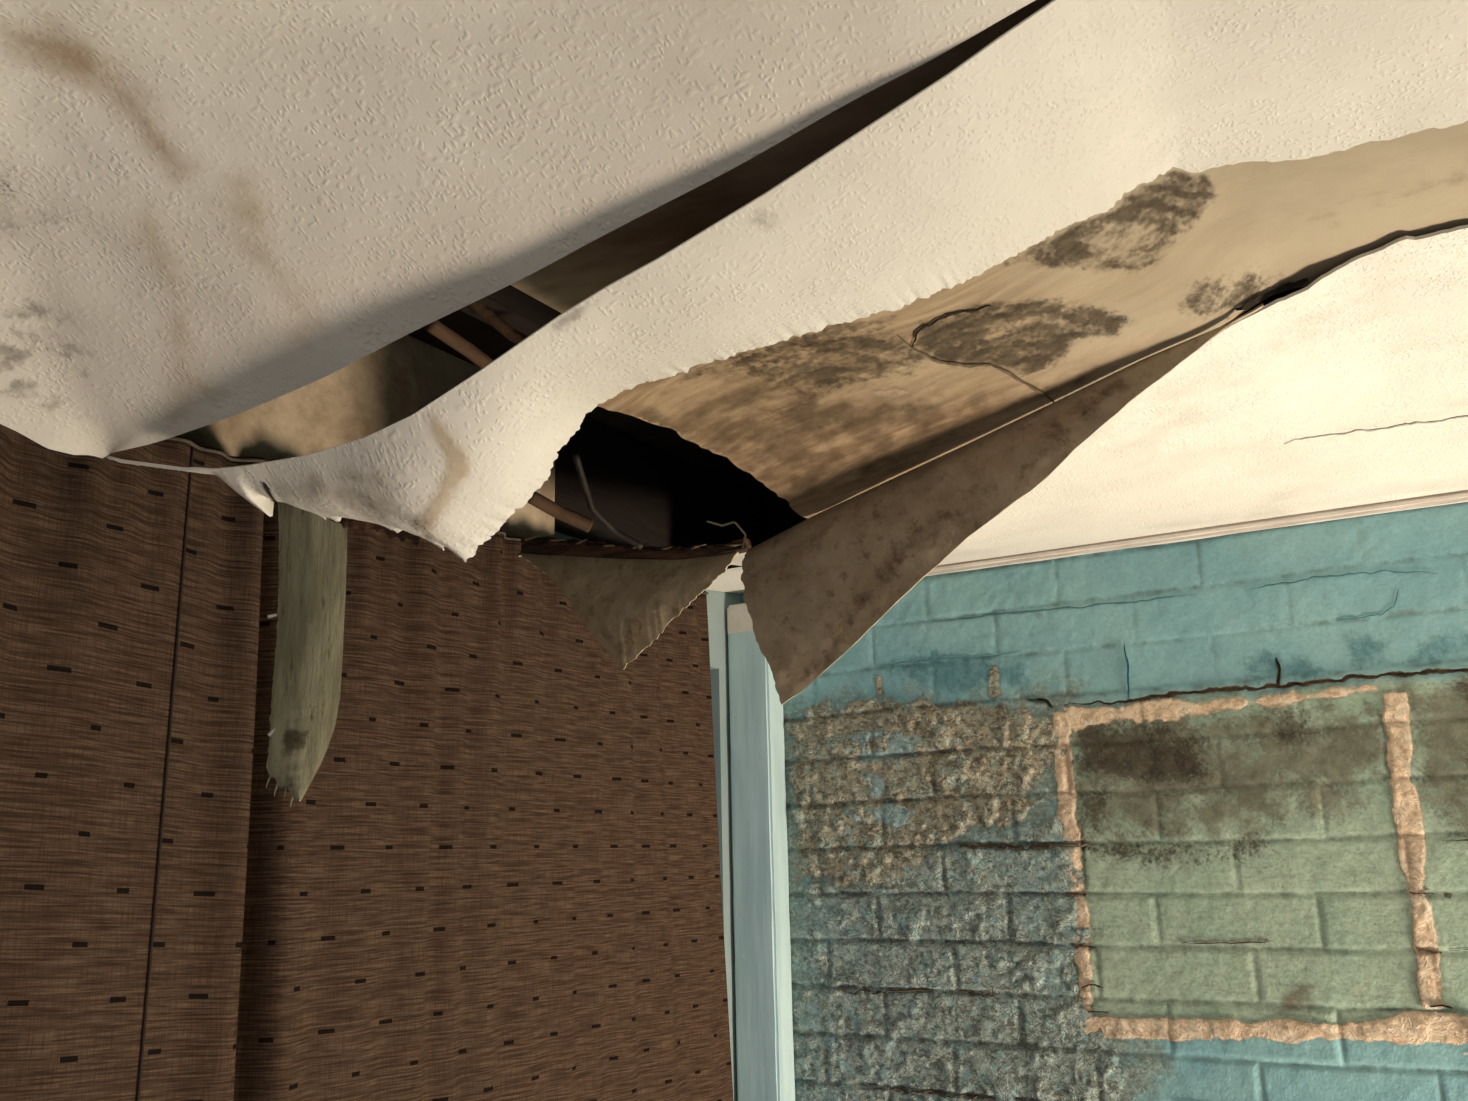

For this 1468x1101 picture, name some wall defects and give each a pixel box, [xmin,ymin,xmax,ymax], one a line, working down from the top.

leakage [1027,172,1213,269]
leakage [1187,276,1260,315]
peeling [519,303,1264,705]
peeling [266,502,347,807]
crack [880,652,1016,666]
crack [921,593,1197,623]
crack [1027,644,1468,708]
leakage [1069,701,1387,869]
leakage [1387,679,1468,836]
peeling [793,816,1135,1101]